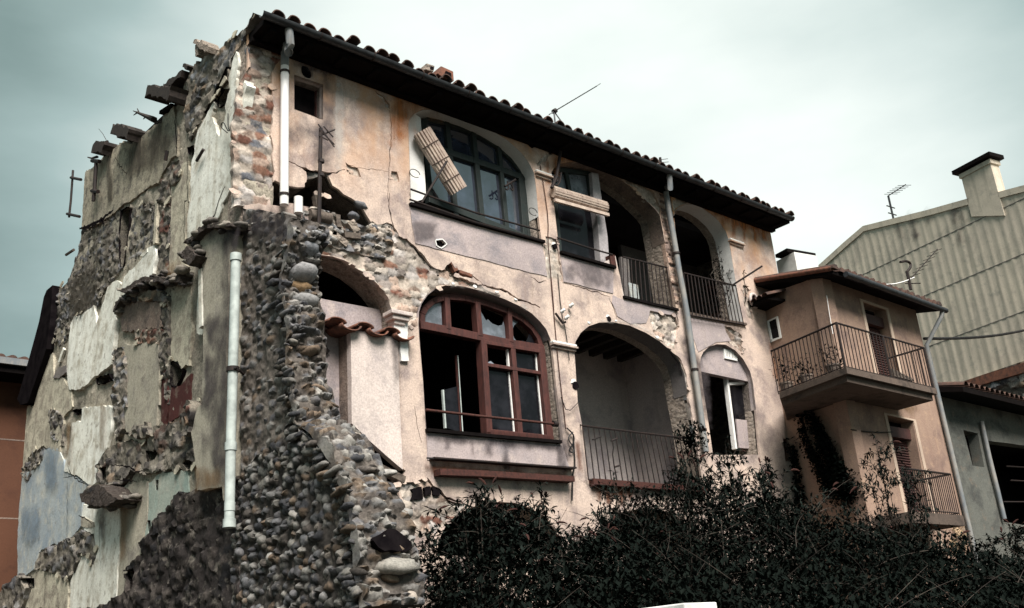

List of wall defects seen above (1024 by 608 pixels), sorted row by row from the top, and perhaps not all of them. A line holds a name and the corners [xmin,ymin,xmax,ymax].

spalling [52,13,263,490]
spalling [273,165,499,344]
spalling [621,179,701,448]
spalling [0,530,98,608]
spalling [21,408,82,483]
spalling [97,488,242,608]
spalling [370,450,463,553]